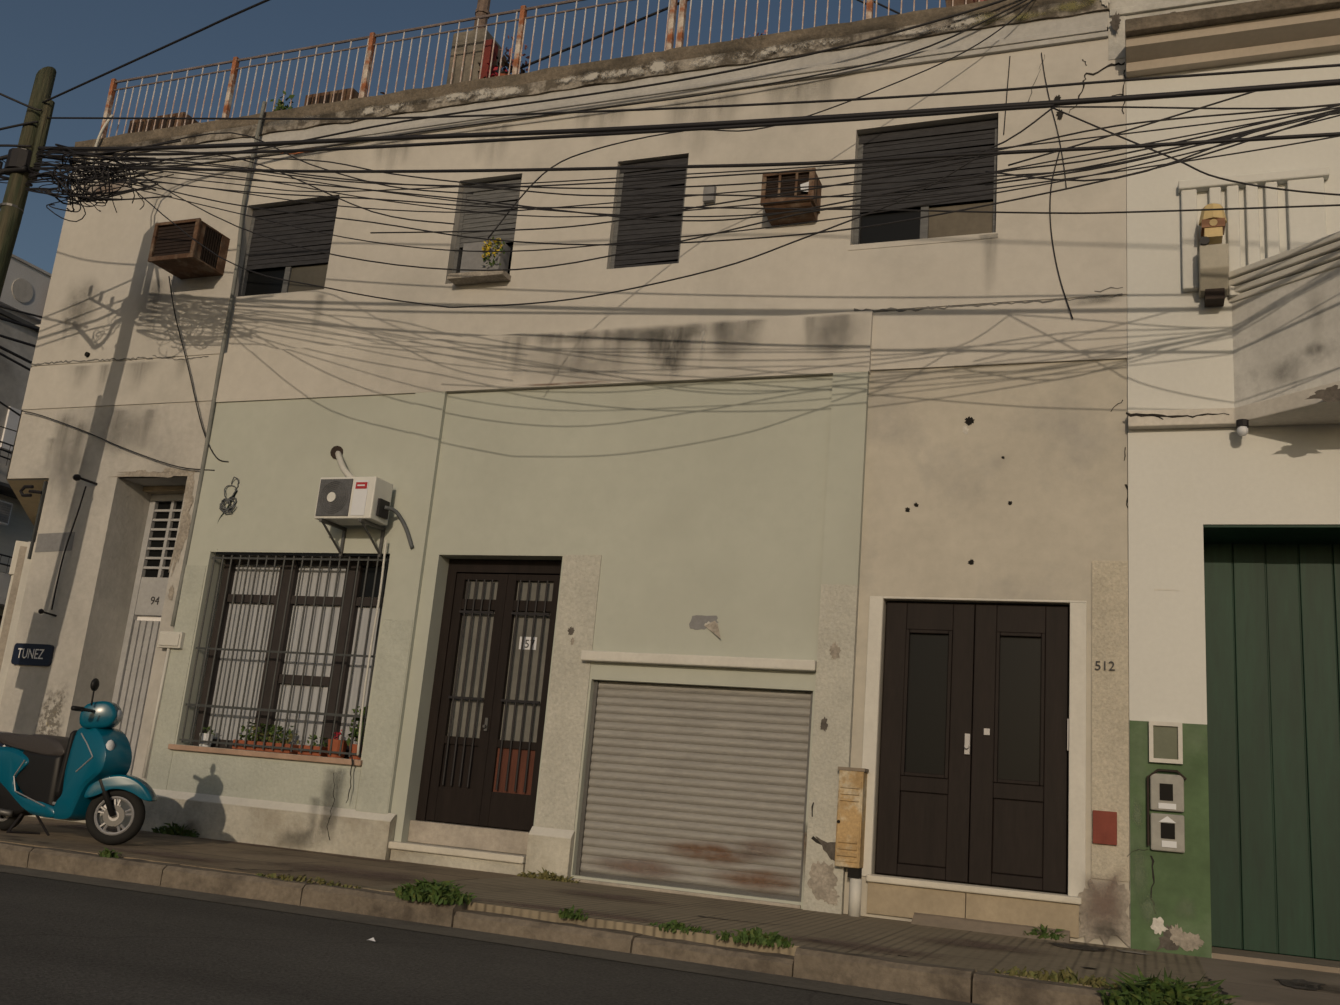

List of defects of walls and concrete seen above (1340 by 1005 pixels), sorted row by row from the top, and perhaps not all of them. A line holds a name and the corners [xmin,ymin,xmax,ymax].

crack [1028,55,1126,121]
crack [1111,399,1229,508]
flaking render [807,836,840,905]
flaking render [1048,876,1204,955]